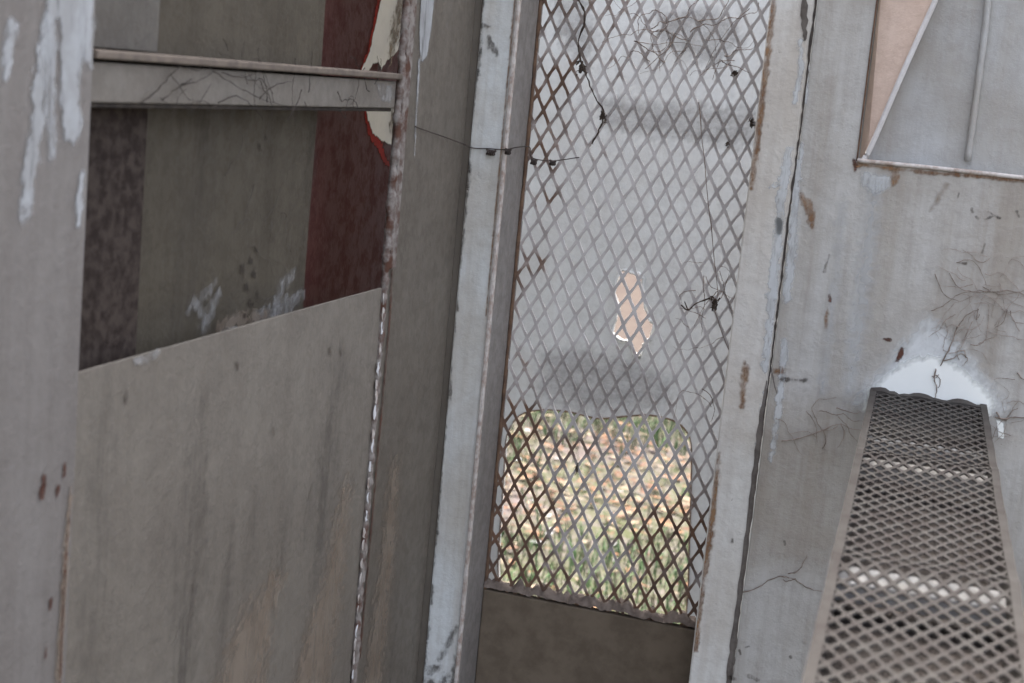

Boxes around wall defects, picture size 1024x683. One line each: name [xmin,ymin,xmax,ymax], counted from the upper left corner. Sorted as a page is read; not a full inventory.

peeling [361,0,403,71]
peeling [364,86,395,168]
rust [750,1,774,190]
rust [801,195,815,228]
rust [852,159,900,185]
rust [914,170,1024,182]
peeling [761,144,804,462]
rust [740,363,748,408]
rust [359,269,393,659]
peeling [996,420,1004,439]
rust [39,464,73,683]
rust [694,459,719,651]